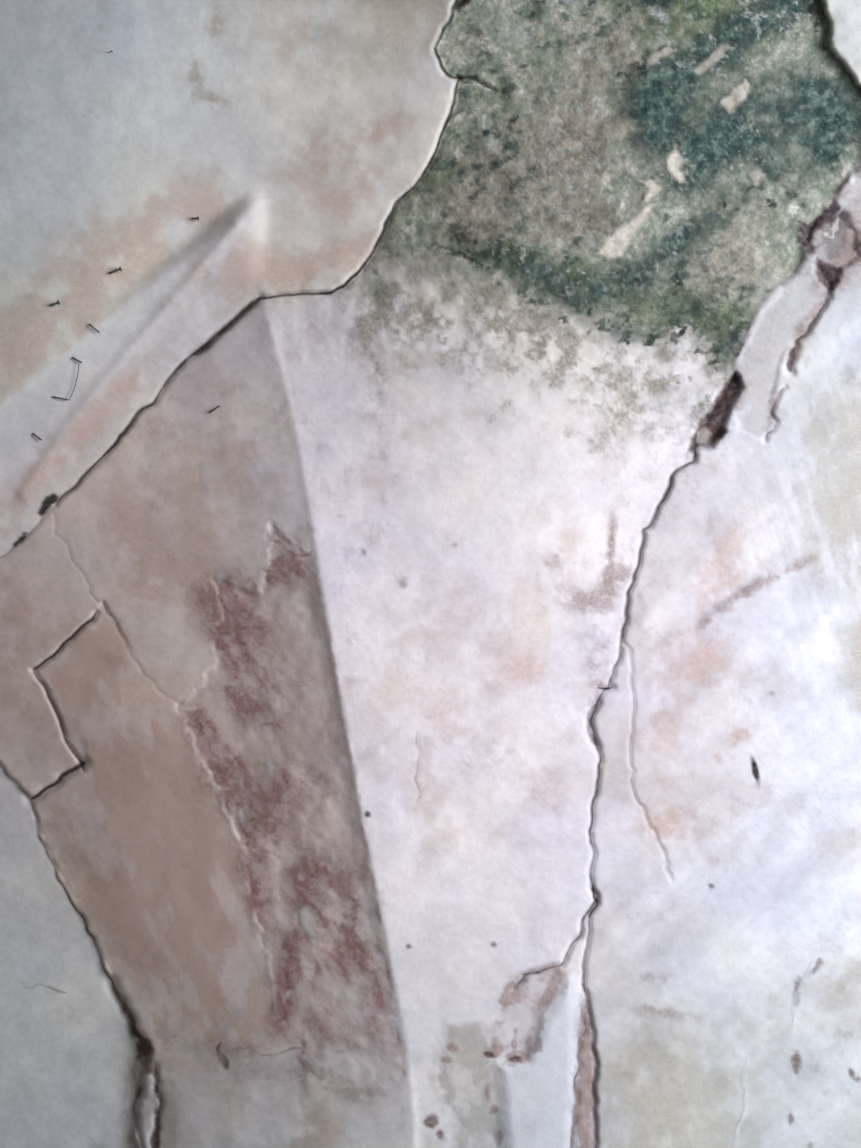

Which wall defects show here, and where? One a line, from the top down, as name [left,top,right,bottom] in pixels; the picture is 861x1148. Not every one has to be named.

leakage [363,280,400,346]
leakage [378,0,861,385]
spalling [788,185,861,373]
crack [31,612,97,799]
crack [39,836,95,941]
peeling [201,531,388,1033]
crack [517,448,696,1148]
crack [104,970,174,1148]
spalling [501,983,520,1006]
spalling [540,978,557,1009]